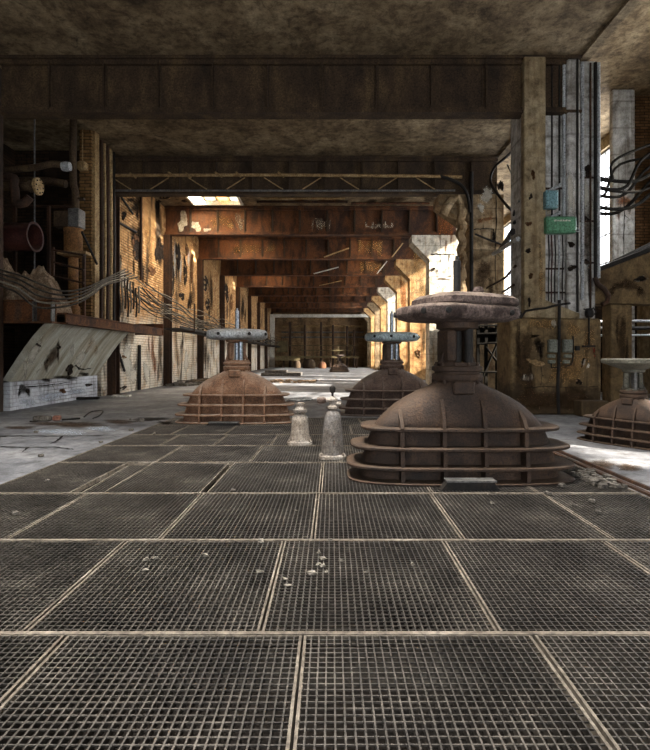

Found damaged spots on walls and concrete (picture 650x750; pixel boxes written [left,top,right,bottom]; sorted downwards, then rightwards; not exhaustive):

peeling [178,200,211,232]
flaking render [148,239,194,301]